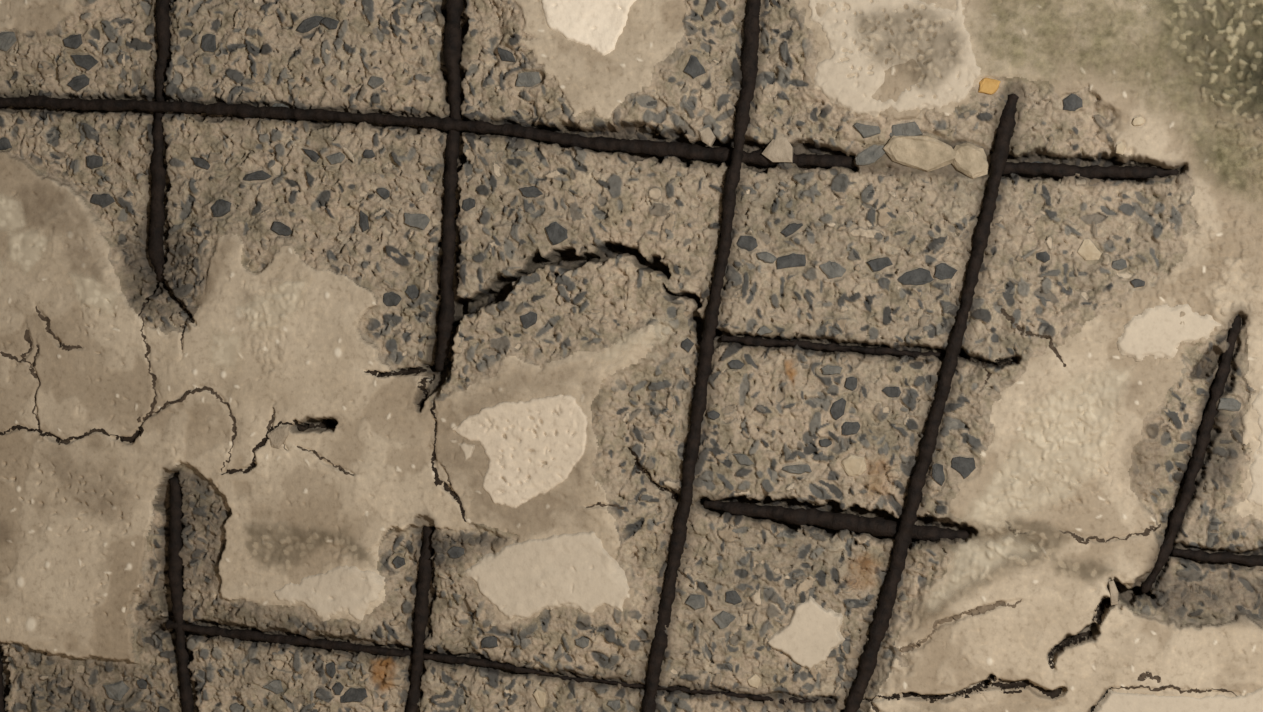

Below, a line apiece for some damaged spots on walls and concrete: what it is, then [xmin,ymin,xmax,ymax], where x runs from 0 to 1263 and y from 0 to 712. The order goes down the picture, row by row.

damp [993,0,1070,66]
damp [1079,0,1263,114]
crack [0,280,354,476]
spalling [0,0,734,712]
crack [364,364,467,522]
spalling [459,0,1199,712]
crack [1061,524,1161,544]
spalling [1108,314,1263,628]
crack [863,597,1119,712]
crack [1091,671,1235,712]